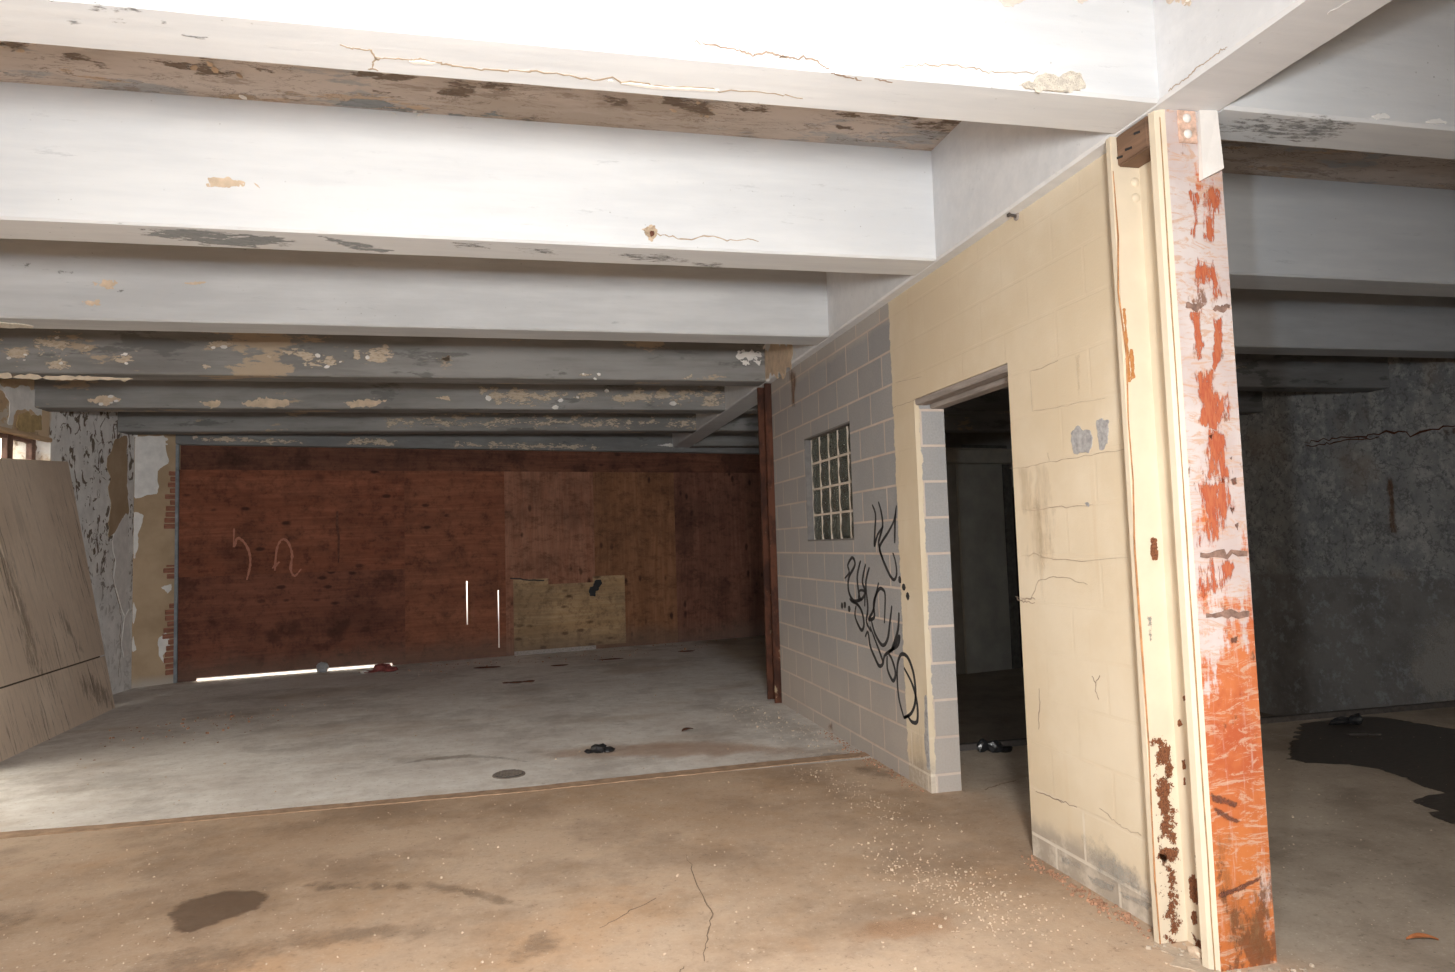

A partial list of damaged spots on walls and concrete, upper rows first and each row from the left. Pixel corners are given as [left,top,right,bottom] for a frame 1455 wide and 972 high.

crack [340,40,1038,99]
spalling [1019,71,1086,93]
peeling [206,177,260,188]
crack [657,233,759,242]
peeling [202,340,233,369]
peeling [267,344,394,369]
peeling [242,397,289,408]
crack [1304,425,1455,447]
water stain [1288,717,1455,824]
rust [1149,719,1201,949]
crack [679,855,714,972]